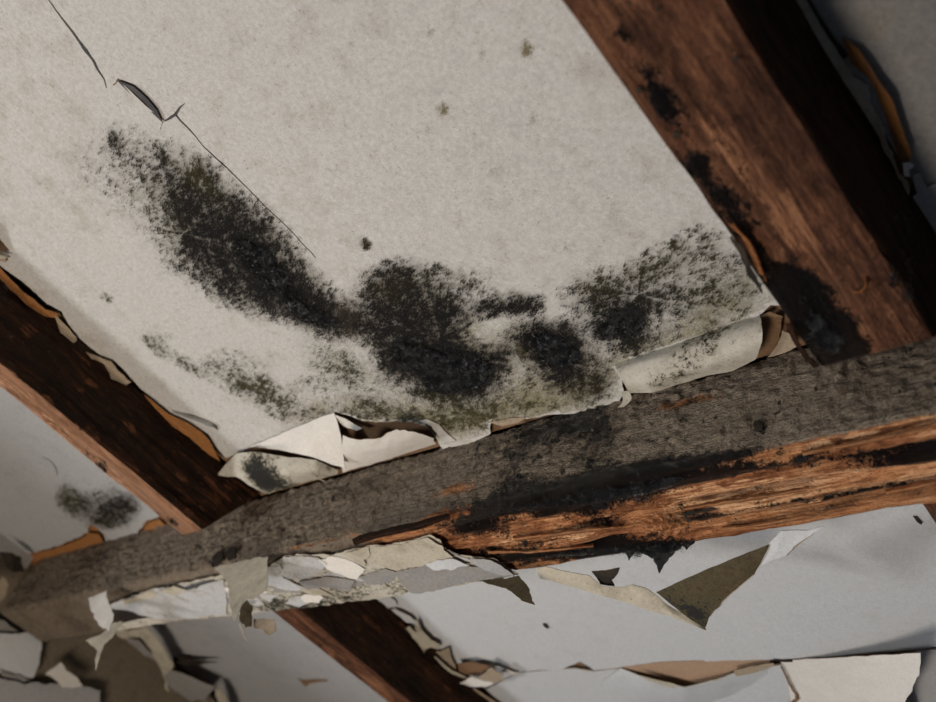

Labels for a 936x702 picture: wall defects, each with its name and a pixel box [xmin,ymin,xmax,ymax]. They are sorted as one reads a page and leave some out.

crack [48,0,316,258]
water stain [75,127,762,436]
mould [54,485,141,530]
peeling [102,534,519,630]
peeling [0,620,100,702]